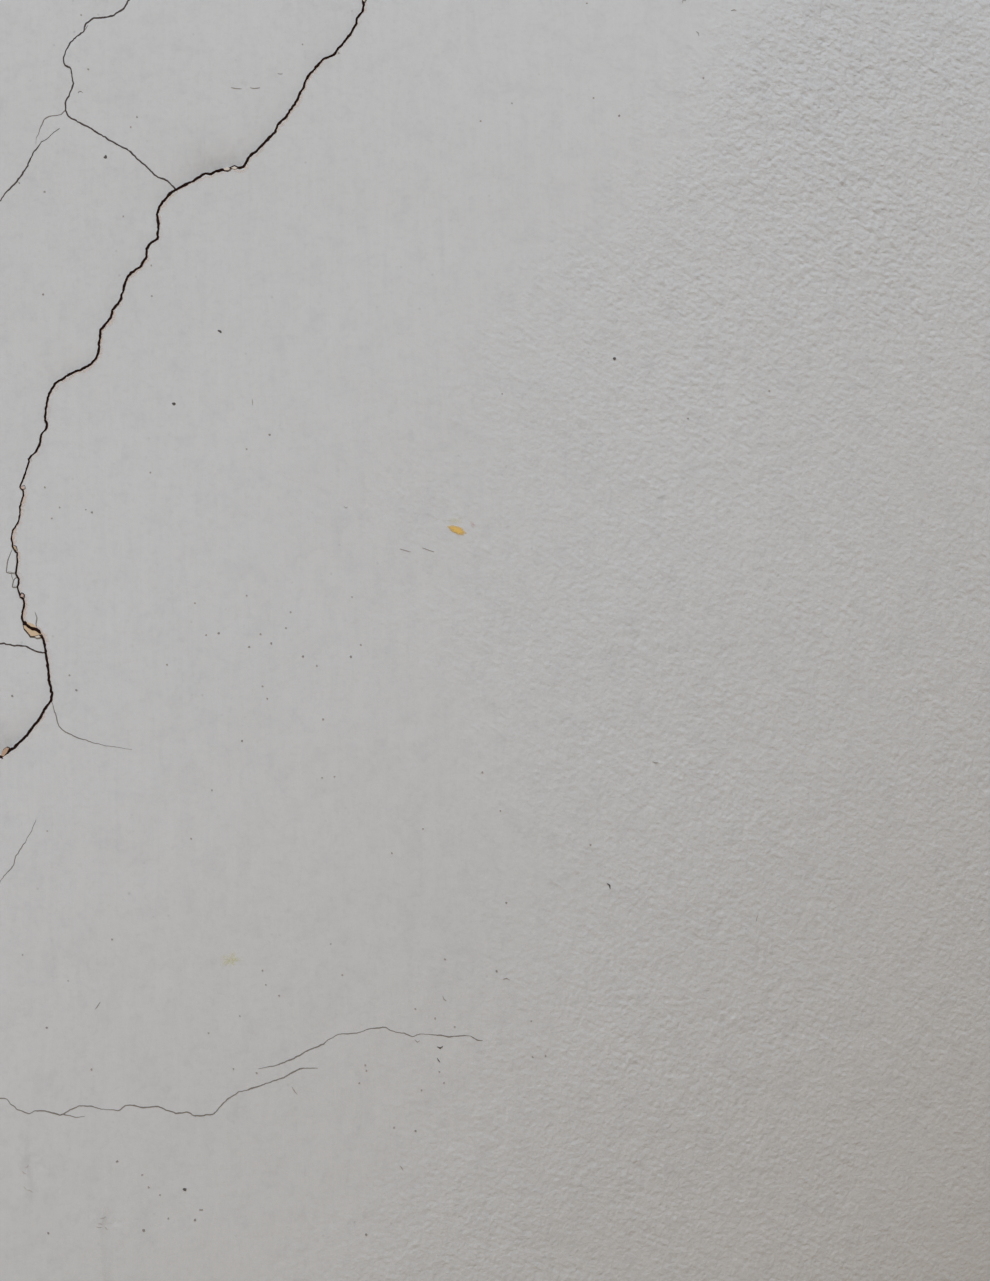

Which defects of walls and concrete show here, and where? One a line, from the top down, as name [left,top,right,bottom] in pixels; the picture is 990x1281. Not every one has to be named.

crack [0,0,365,758]
crack [0,1027,483,1118]